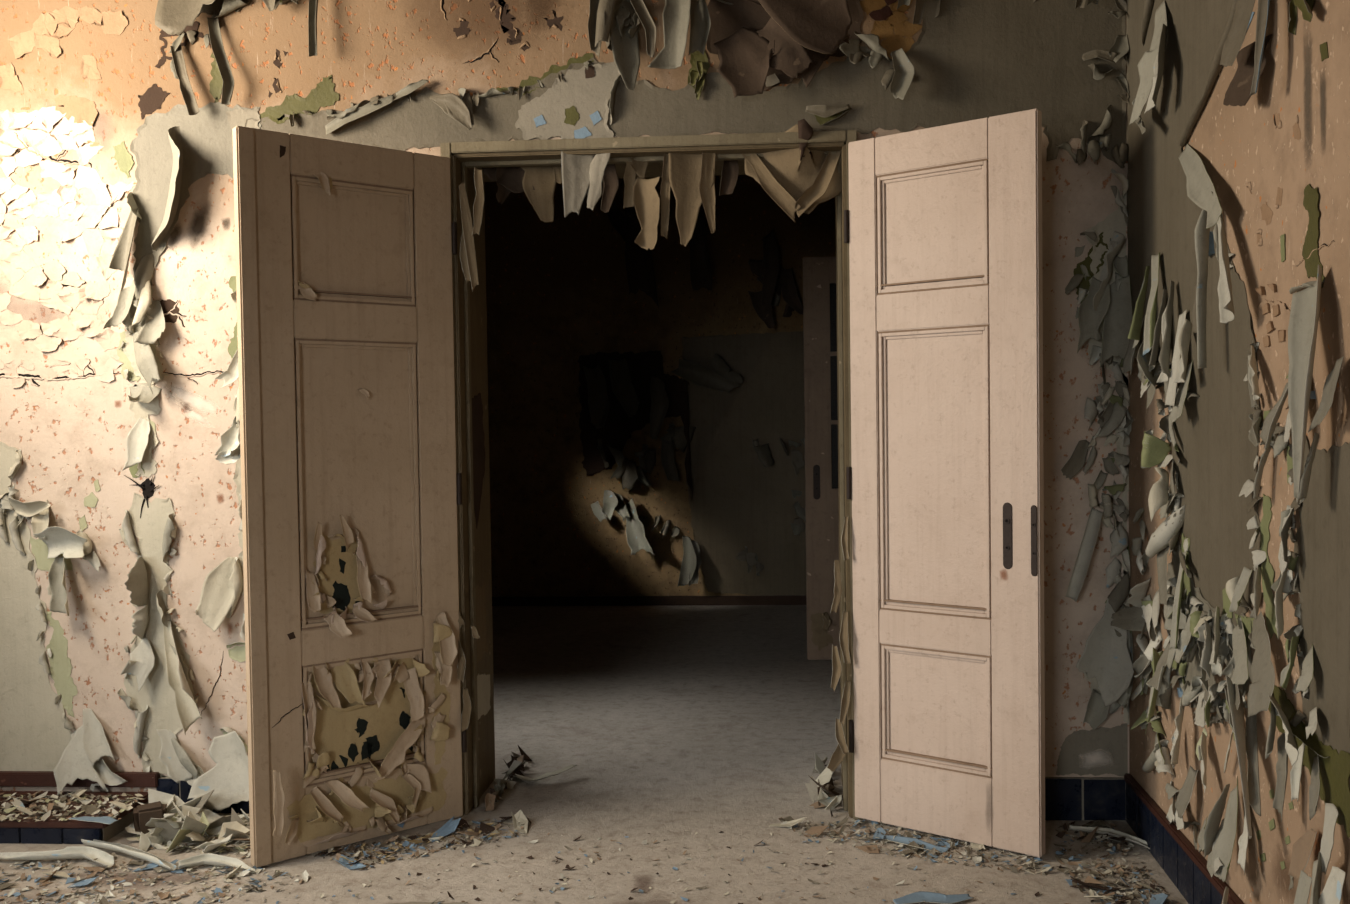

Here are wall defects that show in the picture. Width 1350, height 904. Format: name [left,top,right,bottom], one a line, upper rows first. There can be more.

crack [3,120,93,171]
peeling [459,150,739,292]
peeling [0,0,622,811]
peeling [588,0,1350,882]
peeling [315,809,528,870]
peeling [1065,876,1179,904]
peeling [1280,754,1346,904]